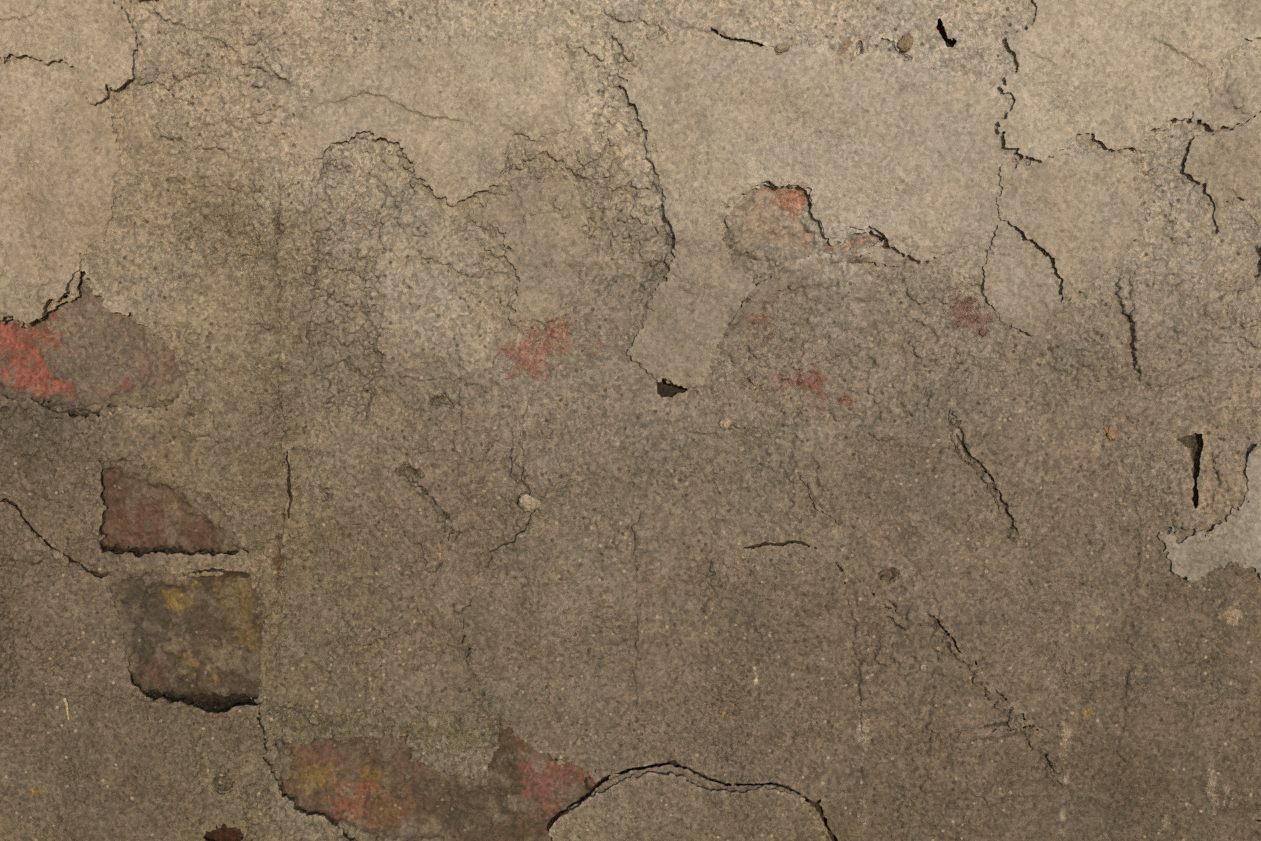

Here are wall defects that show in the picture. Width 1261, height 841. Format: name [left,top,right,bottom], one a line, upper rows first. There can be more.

peeling [0,0,188,417]
peeling [294,36,588,328]
peeling [617,0,1261,389]
flaking render [100,460,603,841]
crack [584,760,838,841]
crack [743,540,1037,743]